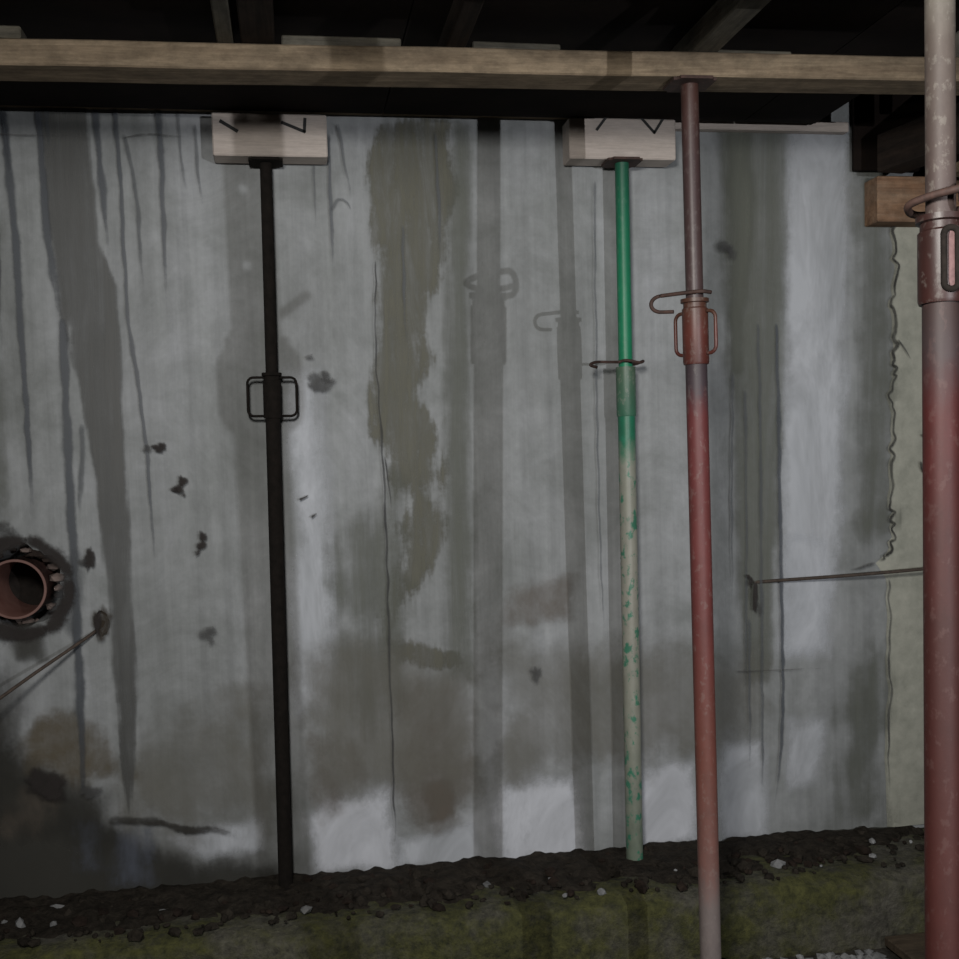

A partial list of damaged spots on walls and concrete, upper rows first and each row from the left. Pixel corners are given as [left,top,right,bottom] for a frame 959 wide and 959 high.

damp [35,107,152,806]
spalling [143,443,166,453]
spalling [171,475,188,496]
spalling [309,371,335,391]
damp [721,132,846,837]
crack [858,226,908,569]
spalling [0,535,95,641]
spalling [195,532,207,555]
crack [886,582,894,755]
efflorescence [312,793,479,872]
damp [494,738,582,858]
efflorescence [642,765,695,843]